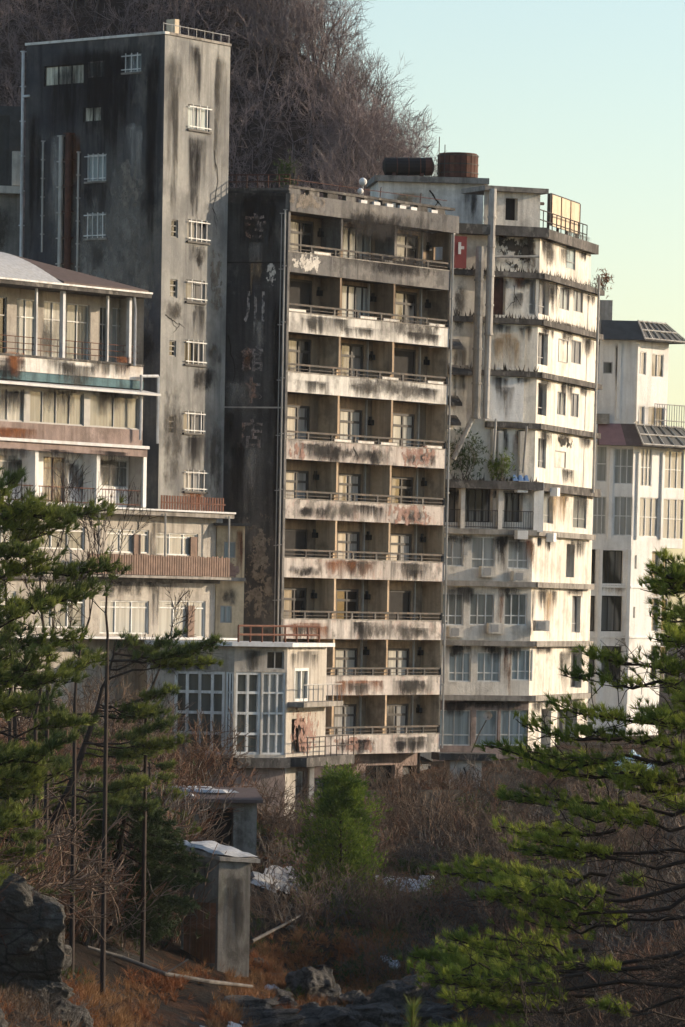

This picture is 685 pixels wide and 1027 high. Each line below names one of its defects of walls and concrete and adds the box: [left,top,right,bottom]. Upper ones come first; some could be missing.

damp [130,61,181,211]
peeling [292,252,321,272]
spalling [230,513,274,621]